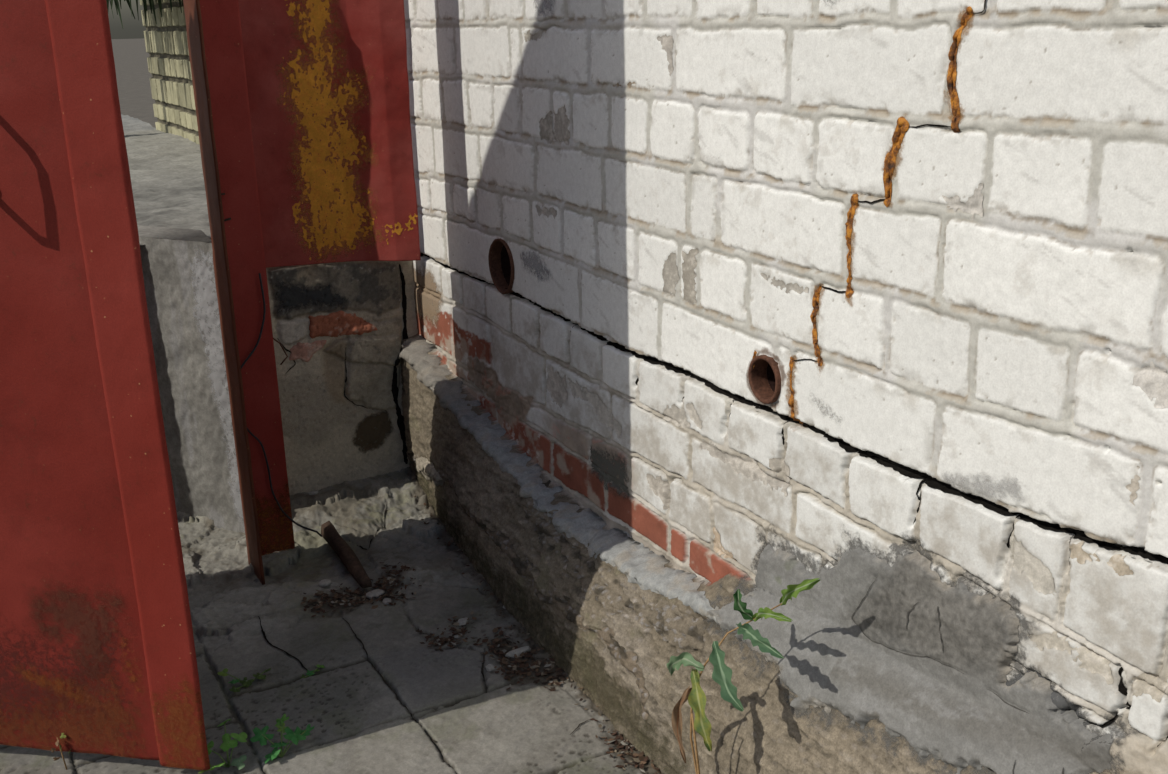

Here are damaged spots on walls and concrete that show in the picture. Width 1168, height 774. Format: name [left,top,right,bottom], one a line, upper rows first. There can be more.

crack [344,0,1168,564]
water stain [353,411,392,453]
spalling [547,366,622,439]
spalling [663,402,792,497]